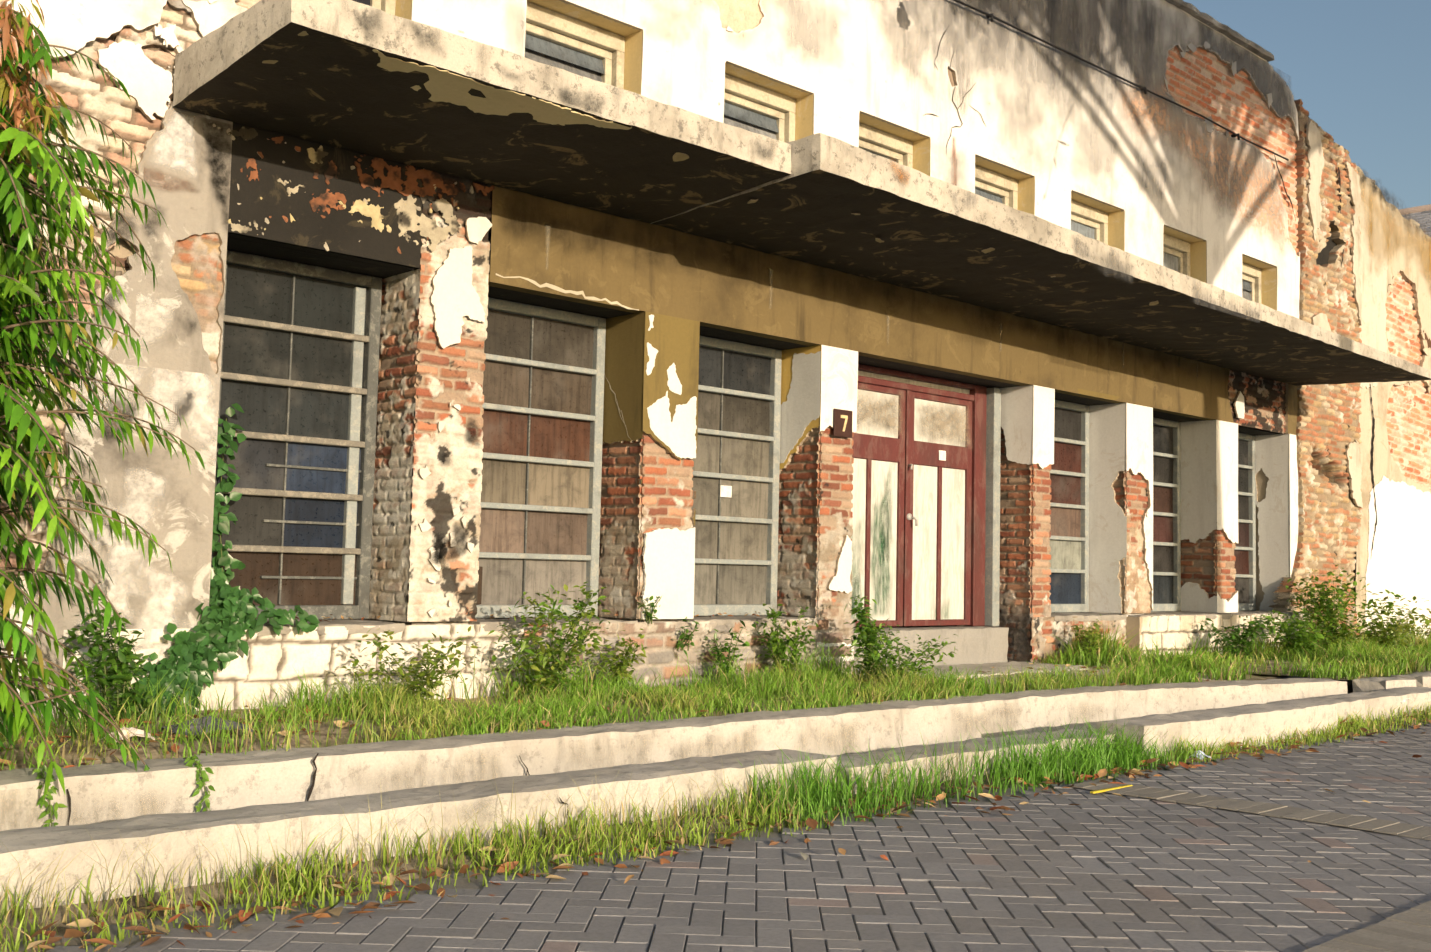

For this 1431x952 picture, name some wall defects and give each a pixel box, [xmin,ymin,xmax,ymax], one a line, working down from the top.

flaking render [3,0,260,499]
peeling [372,49,632,130]
damp [561,90,599,110]
damp [938,0,1291,233]
flaking render [1163,42,1299,255]
flaking render [171,124,495,622]
flaking render [598,314,697,619]
flaking render [777,351,854,620]
flaking render [1112,470,1151,614]
flaking render [1181,530,1236,600]
flaking render [1385,272,1431,489]
crack [307,753,319,801]